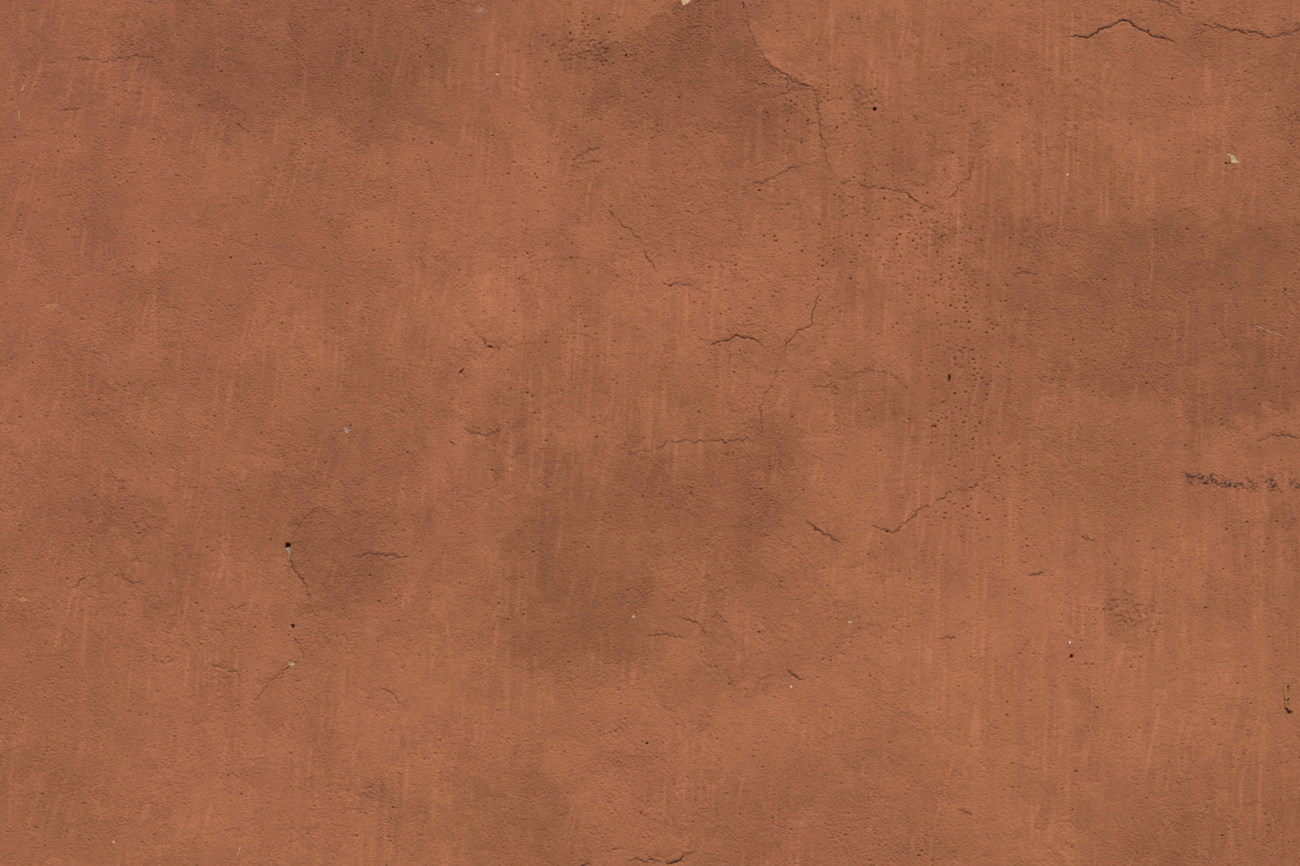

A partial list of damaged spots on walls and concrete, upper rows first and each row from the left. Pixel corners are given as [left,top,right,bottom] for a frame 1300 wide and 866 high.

crack [1068,0,1300,43]
crack [740,1,977,209]
crack [813,369,908,394]
crack [290,512,312,602]
crack [353,551,407,559]